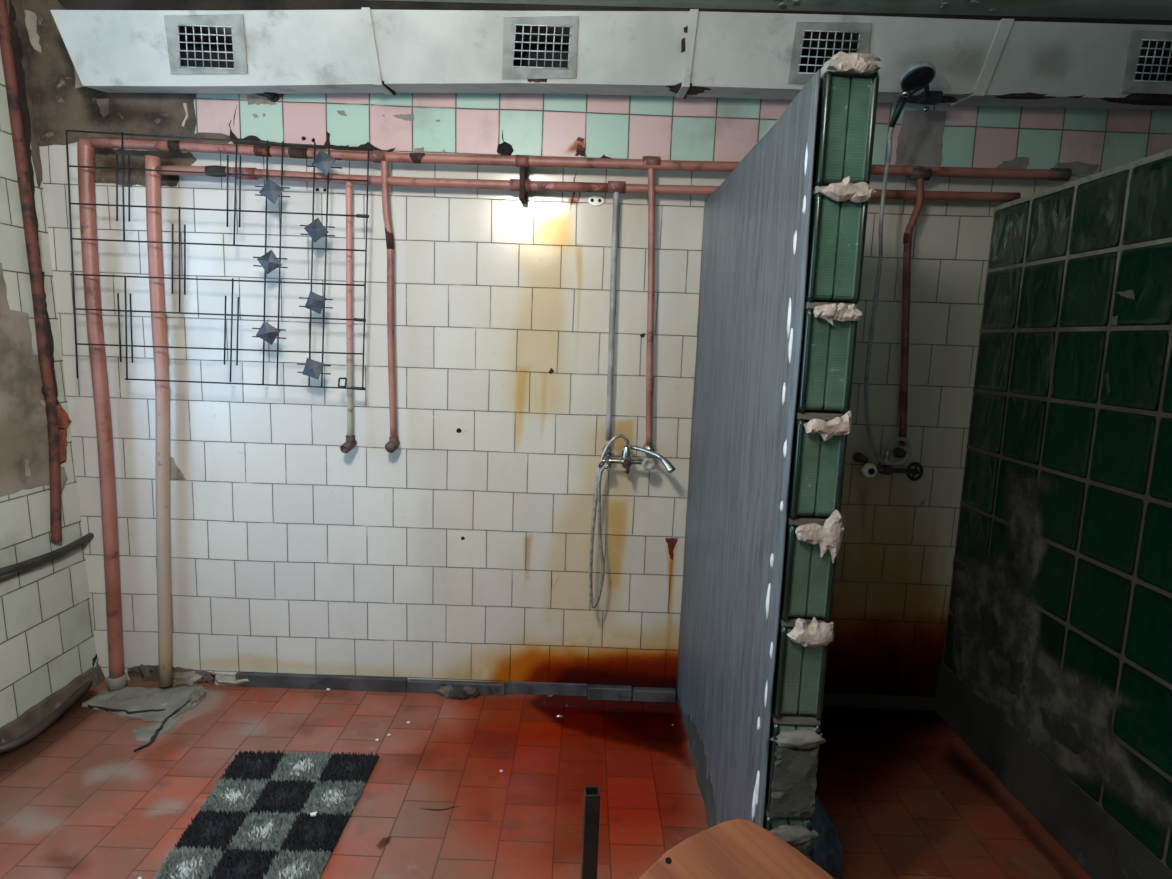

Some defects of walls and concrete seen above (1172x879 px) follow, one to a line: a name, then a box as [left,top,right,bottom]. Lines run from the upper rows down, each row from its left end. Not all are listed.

flaking render [9,0,395,188]
corrosion [1101,93,1172,106]
peeling [895,110,947,167]
flaking render [0,263,50,497]
corrosion [666,538,678,560]
corrosion [531,661,677,690]
corrosion [825,629,946,697]